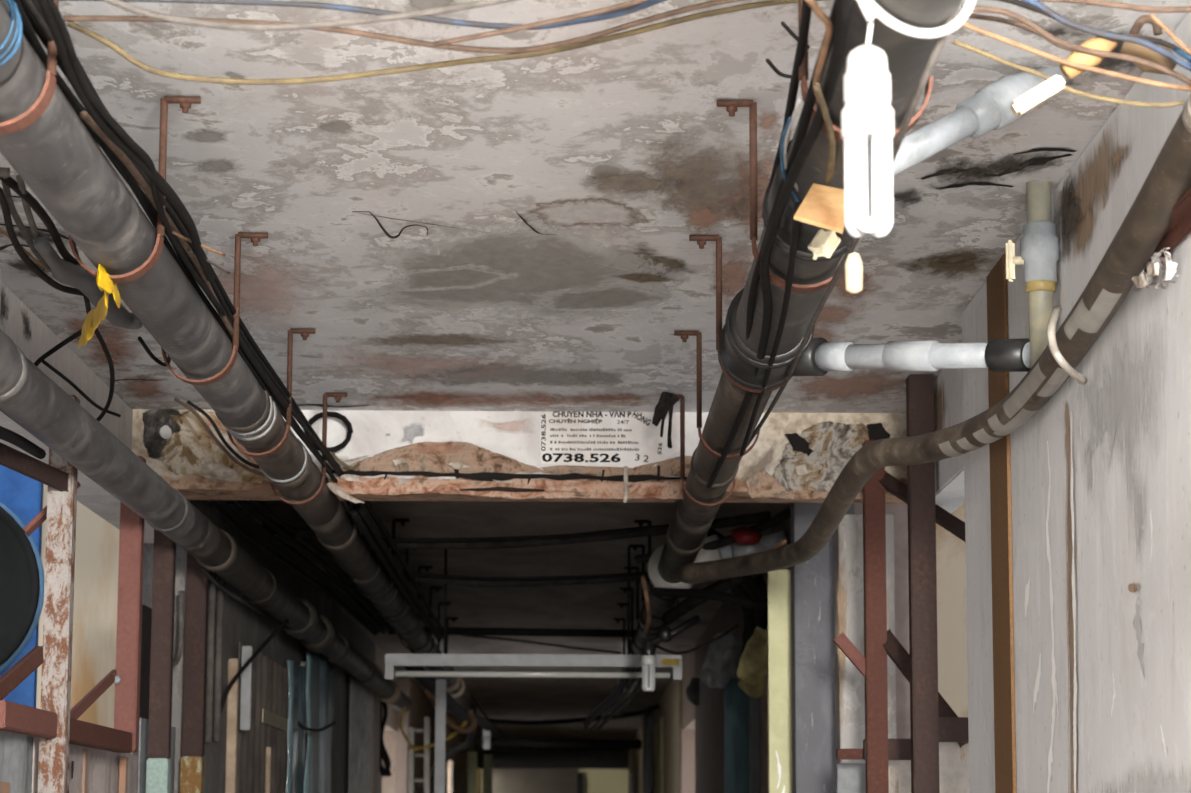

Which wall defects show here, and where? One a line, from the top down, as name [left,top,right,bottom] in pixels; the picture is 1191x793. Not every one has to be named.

water stain [589,141,750,221]
water stain [893,191,921,205]
water stain [936,154,1053,183]
water stain [1059,180,1081,258]
water stain [370,221,684,321]
water stain [371,335,514,346]
spalling [158,410,270,483]
spalling [327,441,692,503]
spalling [746,421,890,500]